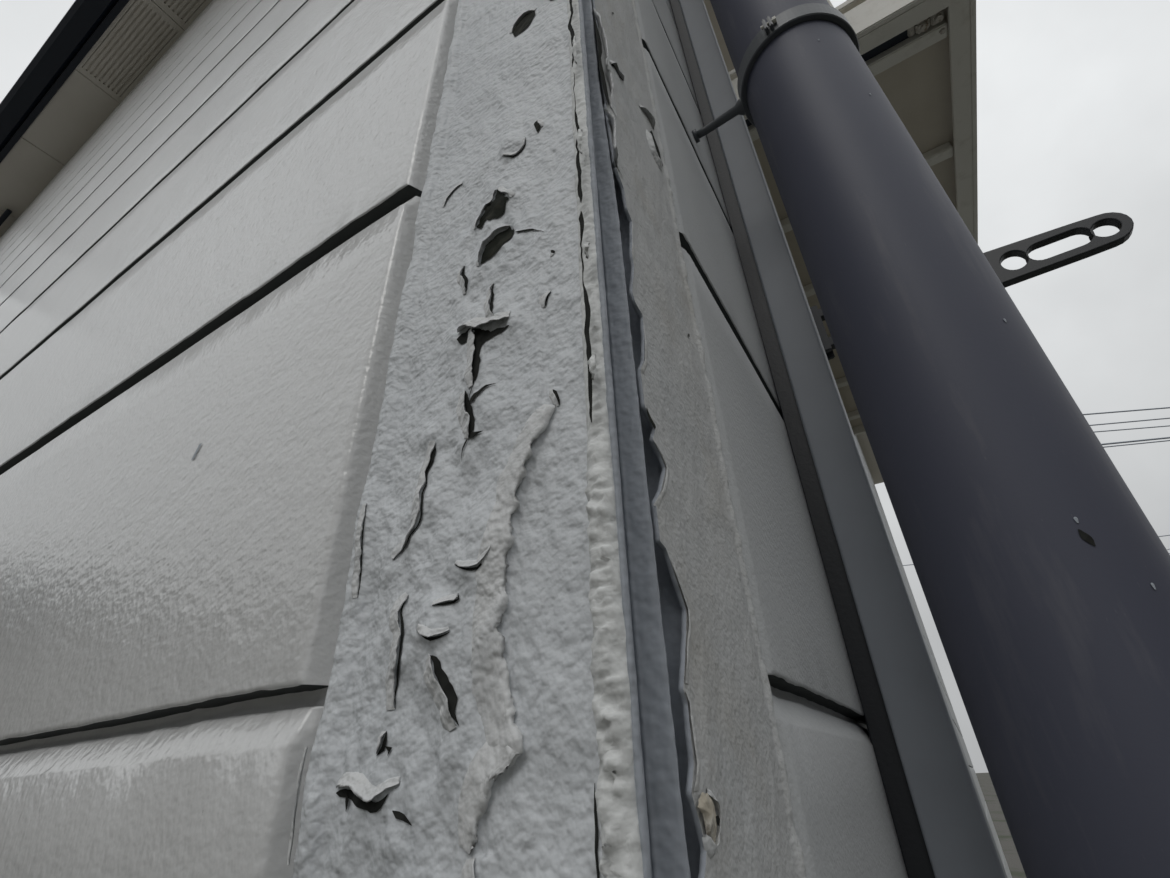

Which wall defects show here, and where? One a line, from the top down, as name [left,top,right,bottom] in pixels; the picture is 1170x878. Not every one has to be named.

peeling [509,8,536,37]
peeling [593,7,624,179]
peeling [640,105,663,172]
peeling [474,186,543,266]
peeling [458,404,556,878]
spalling [668,551,721,859]
peeling [336,772,412,826]